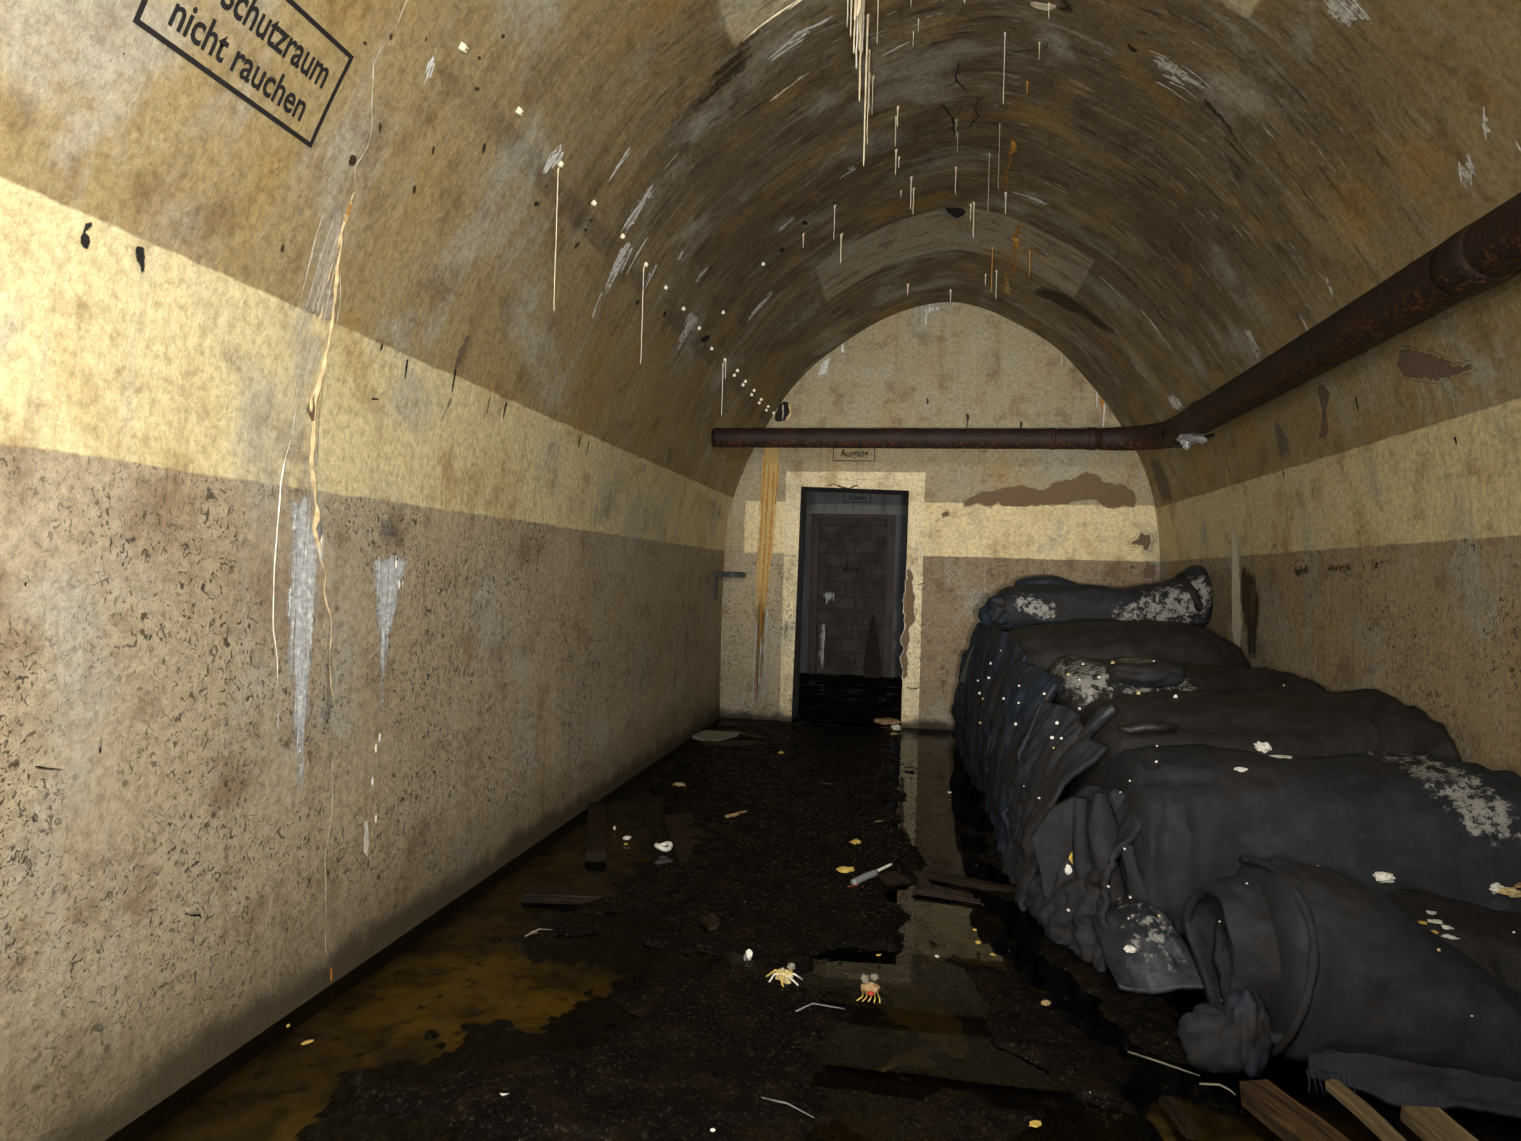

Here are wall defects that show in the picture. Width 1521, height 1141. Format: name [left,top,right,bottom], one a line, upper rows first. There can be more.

leakage [287,497,317,781]
leakage [374,555,406,753]
leakage [363,815,377,857]